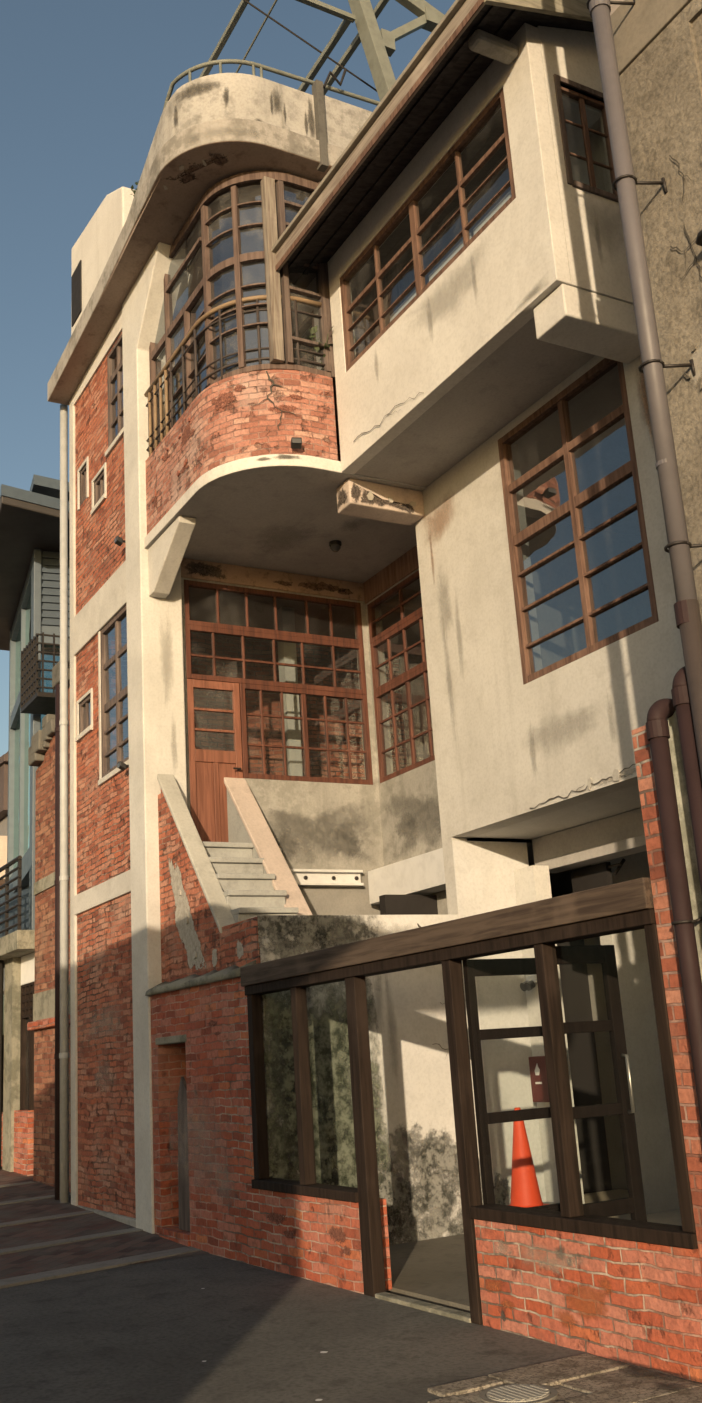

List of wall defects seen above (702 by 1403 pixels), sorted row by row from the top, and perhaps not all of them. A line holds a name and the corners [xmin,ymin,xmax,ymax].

damp [174,83,228,125]
damp [256,95,286,122]
damp [305,100,315,134]
peeling [163,154,228,190]
crack [252,371,299,430]
crack [353,392,421,442]
crack [530,764,635,809]
damp [276,809,358,853]
damp [400,800,440,845]